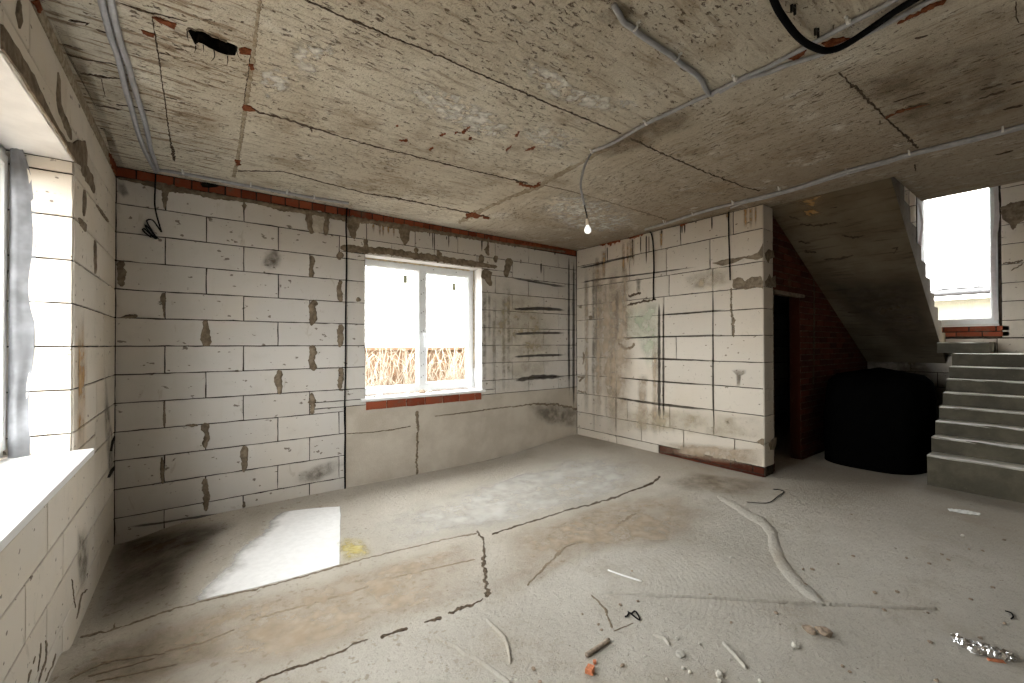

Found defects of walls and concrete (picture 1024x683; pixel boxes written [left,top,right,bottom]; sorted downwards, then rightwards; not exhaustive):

flaking render [141,16,252,64]
crack [838,72,952,171]
crack [979,81,1024,110]
crack [347,261,593,475]
crack [27,476,660,683]